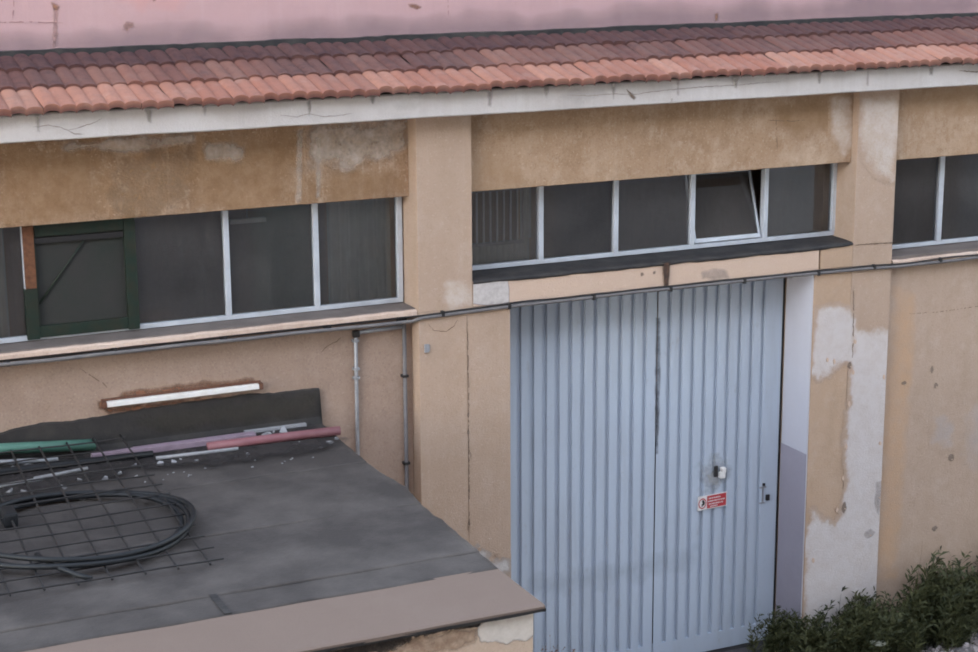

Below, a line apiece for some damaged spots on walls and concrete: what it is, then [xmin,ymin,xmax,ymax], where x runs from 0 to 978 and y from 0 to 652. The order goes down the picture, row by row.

crack [429,321,471,528]
peeling [803,301,888,634]
peeling [330,614,533,652]